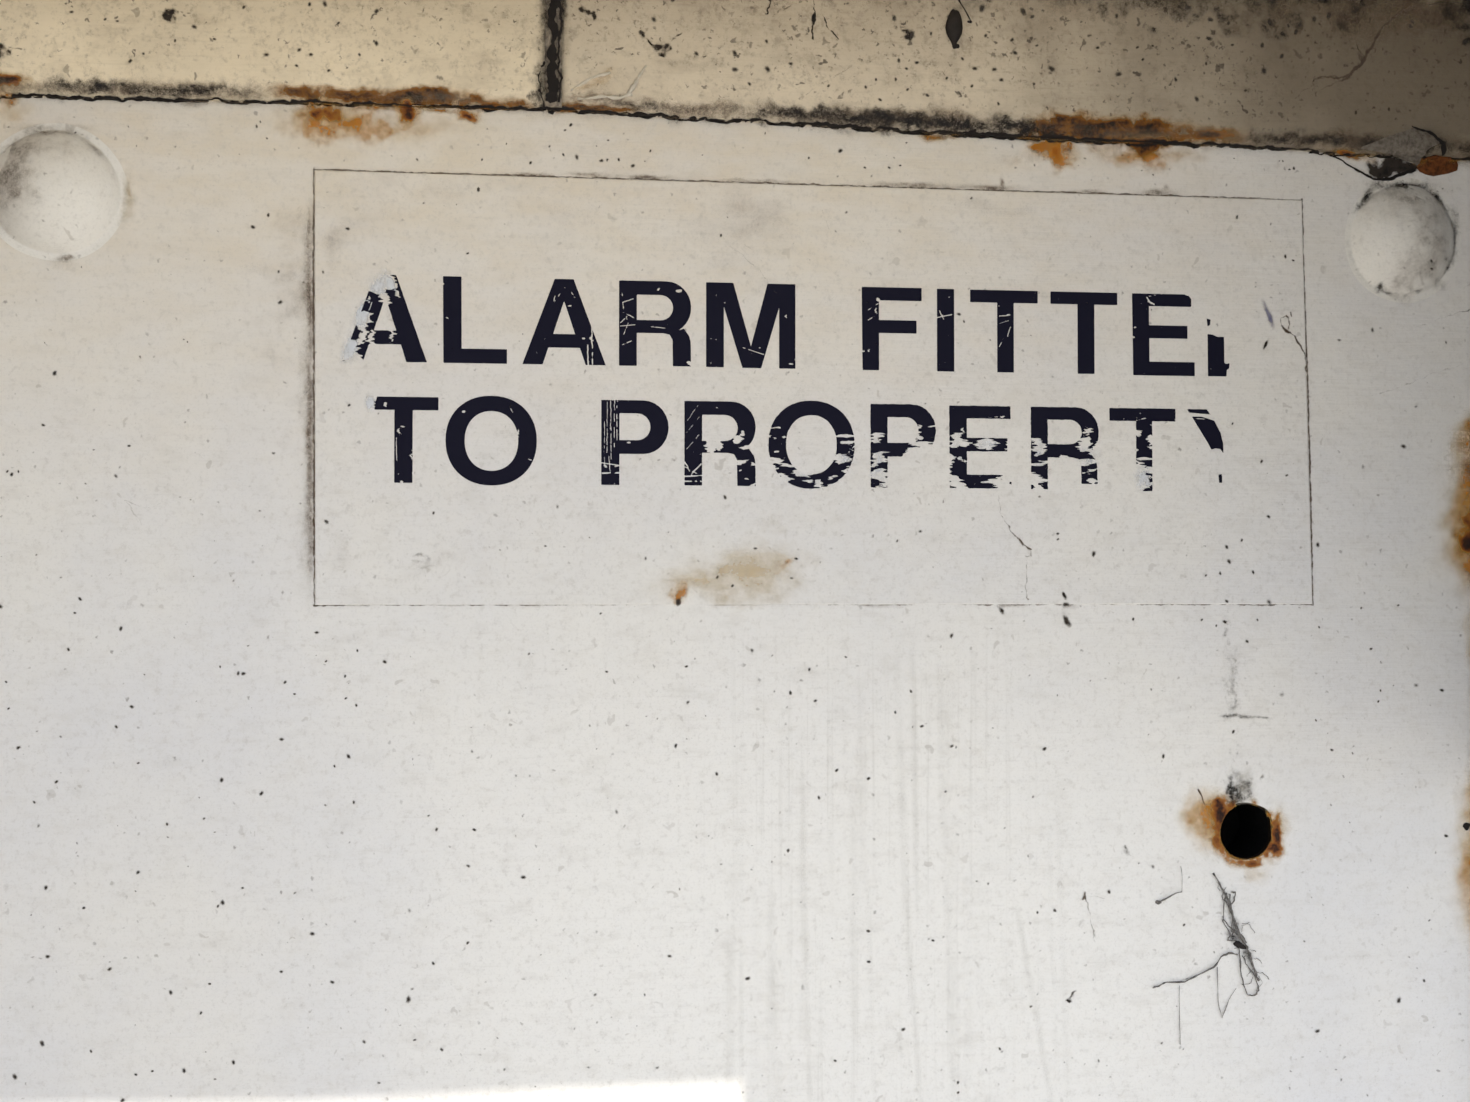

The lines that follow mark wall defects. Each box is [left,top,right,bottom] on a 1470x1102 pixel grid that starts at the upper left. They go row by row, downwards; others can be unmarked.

leakage [639,17,681,57]
rust [278,85,529,138]
rust [1019,112,1238,168]
peeling [1309,126,1447,181]
rust [1454,422,1470,576]
rust [1189,789,1283,868]